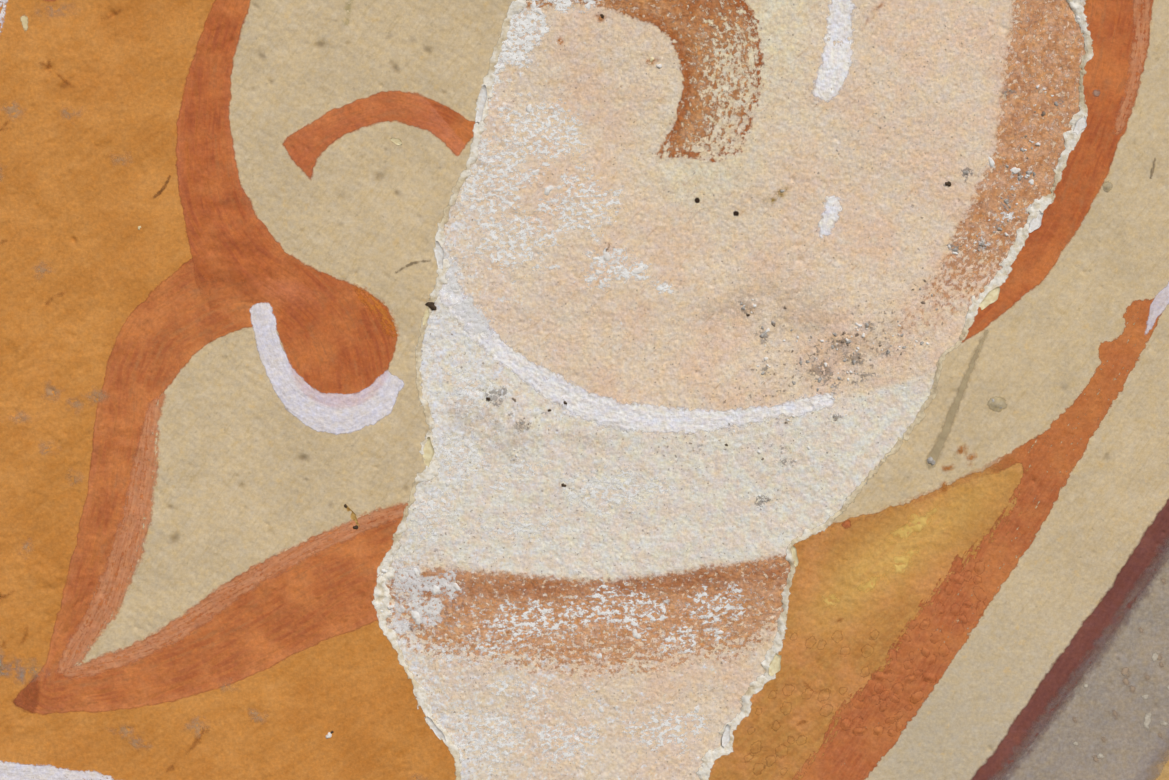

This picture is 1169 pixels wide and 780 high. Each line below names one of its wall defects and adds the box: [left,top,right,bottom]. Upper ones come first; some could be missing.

peeling [372,0,1100,780]